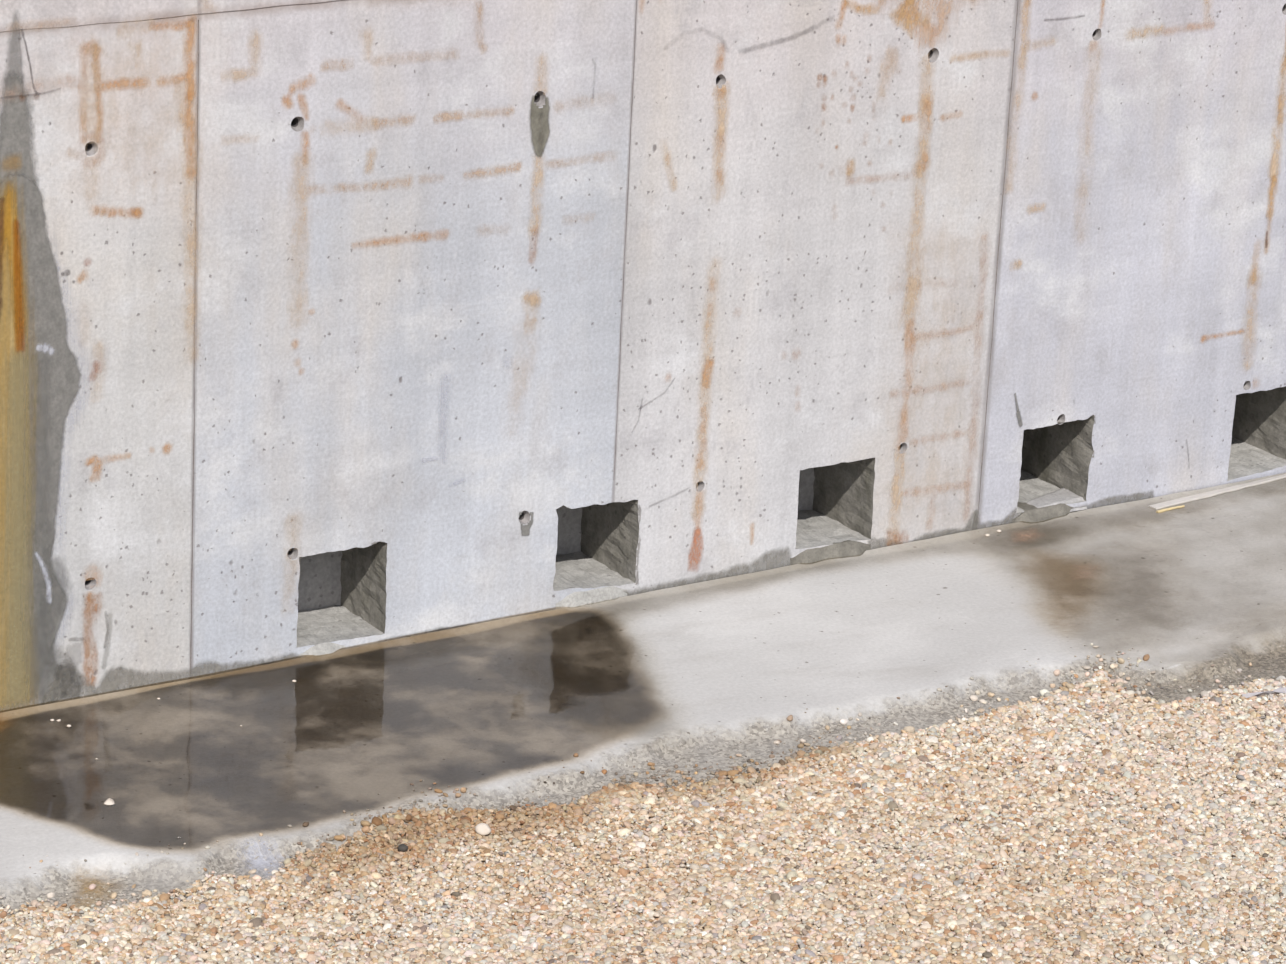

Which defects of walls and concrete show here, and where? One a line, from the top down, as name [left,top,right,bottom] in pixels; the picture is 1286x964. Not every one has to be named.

corrosion [177,20,194,131]
corrosion [898,0,950,41]
corrosion [1270,96,1284,209]
corrosion [0,189,29,709]
water stain [0,75,298,713]
corrosion [690,501,702,566]